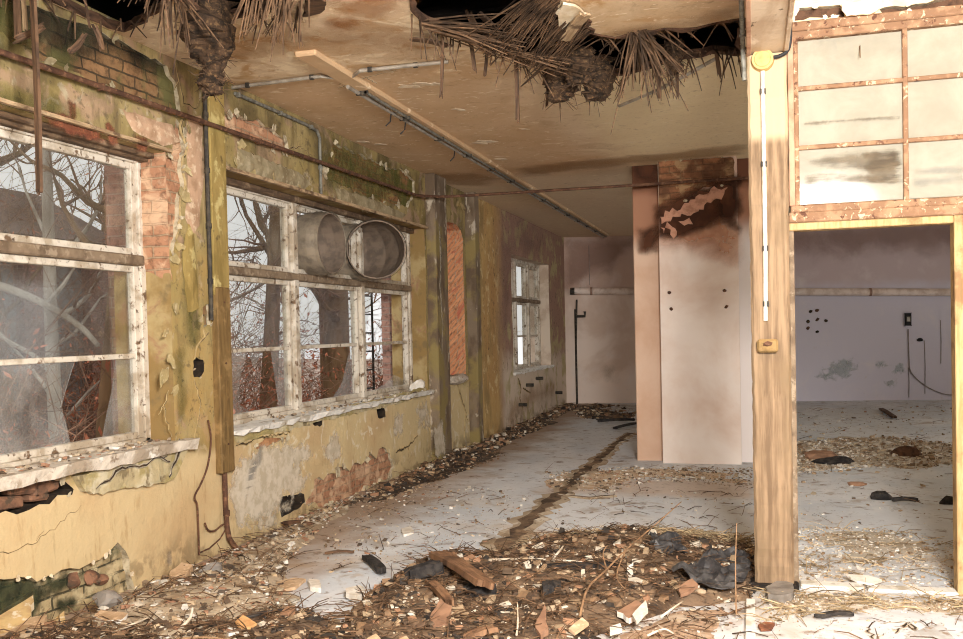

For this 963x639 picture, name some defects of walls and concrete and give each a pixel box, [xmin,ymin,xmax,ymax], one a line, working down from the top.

leakage [0,0,159,70]
flaking render [793,3,844,21]
flaking render [881,0,963,13]
flaking render [0,22,193,279]
flaking render [658,156,734,239]
crack [96,328,210,489]
spalling [0,476,71,511]
flaking render [280,448,392,512]
crack [0,507,80,554]
flaking render [0,546,137,621]